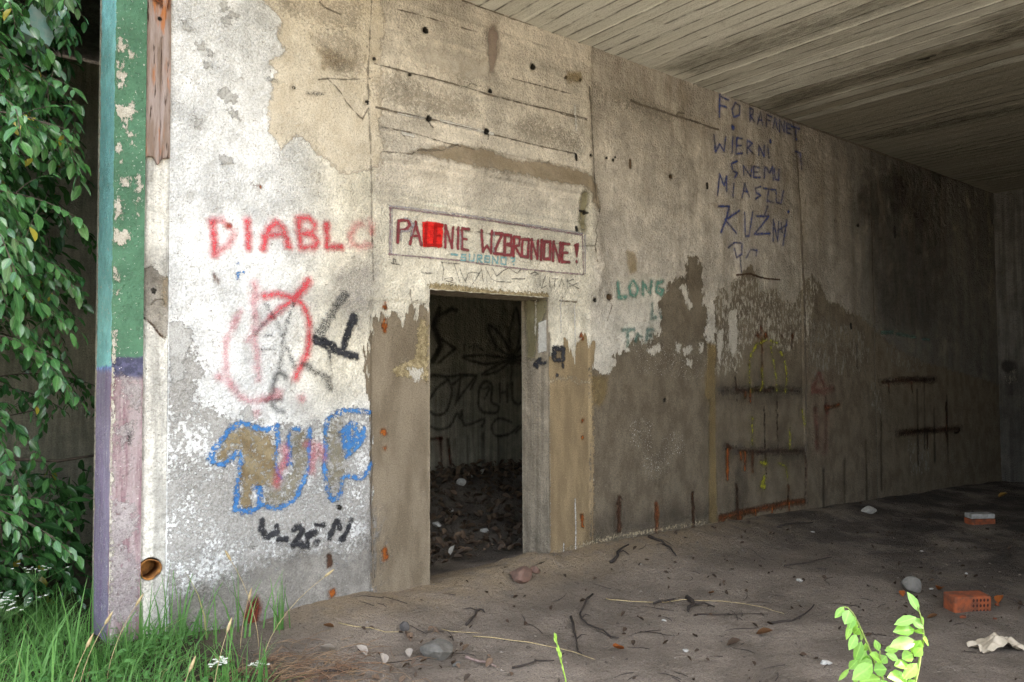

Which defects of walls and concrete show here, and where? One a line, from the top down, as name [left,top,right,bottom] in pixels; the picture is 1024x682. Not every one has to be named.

peeling [116,36,137,89]
peeling [114,100,144,246]
peeling [263,0,385,175]
peeling [144,266,430,635]
corrosion [719,326,807,522]
peeling [549,255,1002,553]